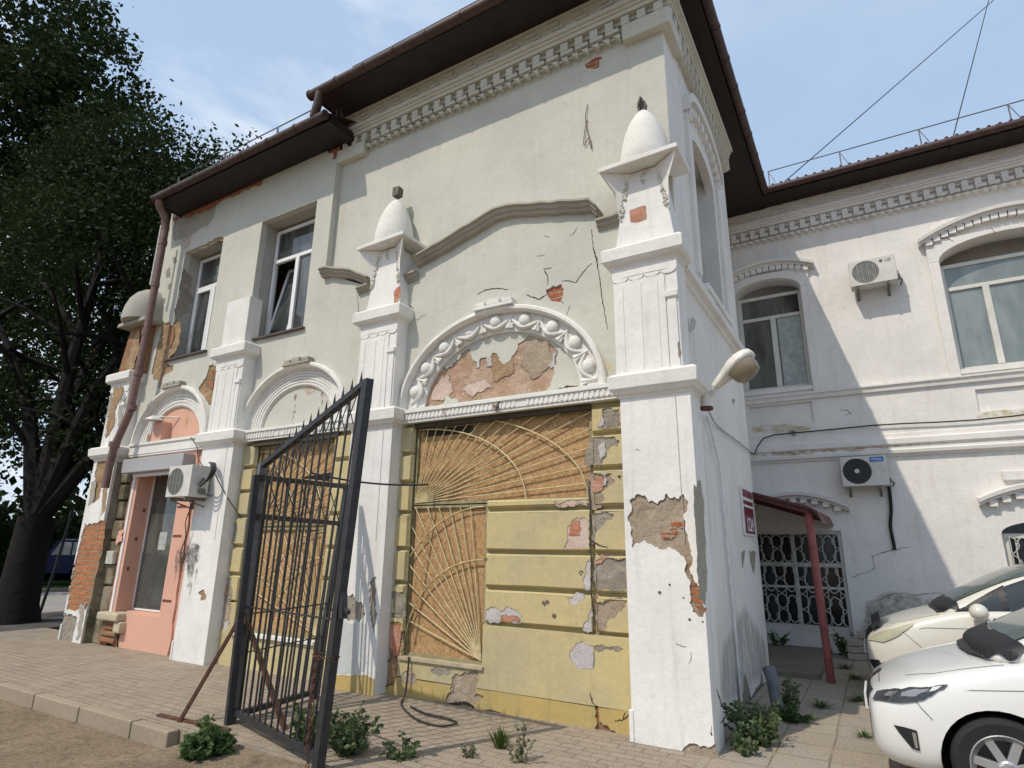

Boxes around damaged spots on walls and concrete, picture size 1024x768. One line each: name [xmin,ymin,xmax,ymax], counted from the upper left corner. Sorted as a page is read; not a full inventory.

flaking render [153,180,263,388]
crack [477,228,608,330]
flaking render [200,365,216,405]
flaking render [427,335,578,407]
flaking render [57,461,123,642]
flaking render [555,407,627,670]
flaking render [628,481,707,623]
peeling [337,577,377,675]
peeling [484,606,523,624]
flaking render [431,667,484,707]